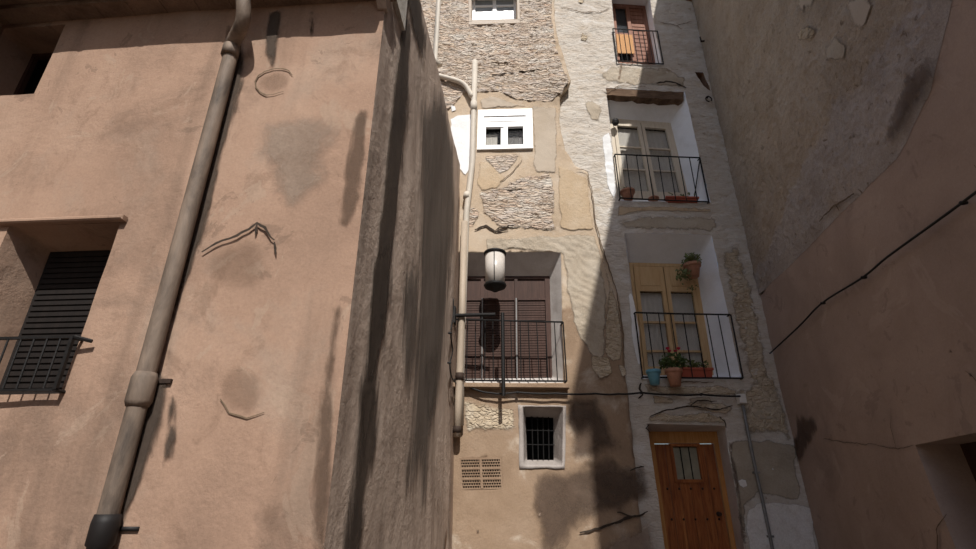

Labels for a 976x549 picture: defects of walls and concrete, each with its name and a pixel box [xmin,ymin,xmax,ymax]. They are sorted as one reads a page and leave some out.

water stain [266,11,280,64]
water stain [173,46,243,317]
crack [201,222,277,254]
water stain [342,0,426,549]
water stain [403,102,454,500]
spalling [451,106,555,229]
water stain [316,354,334,537]